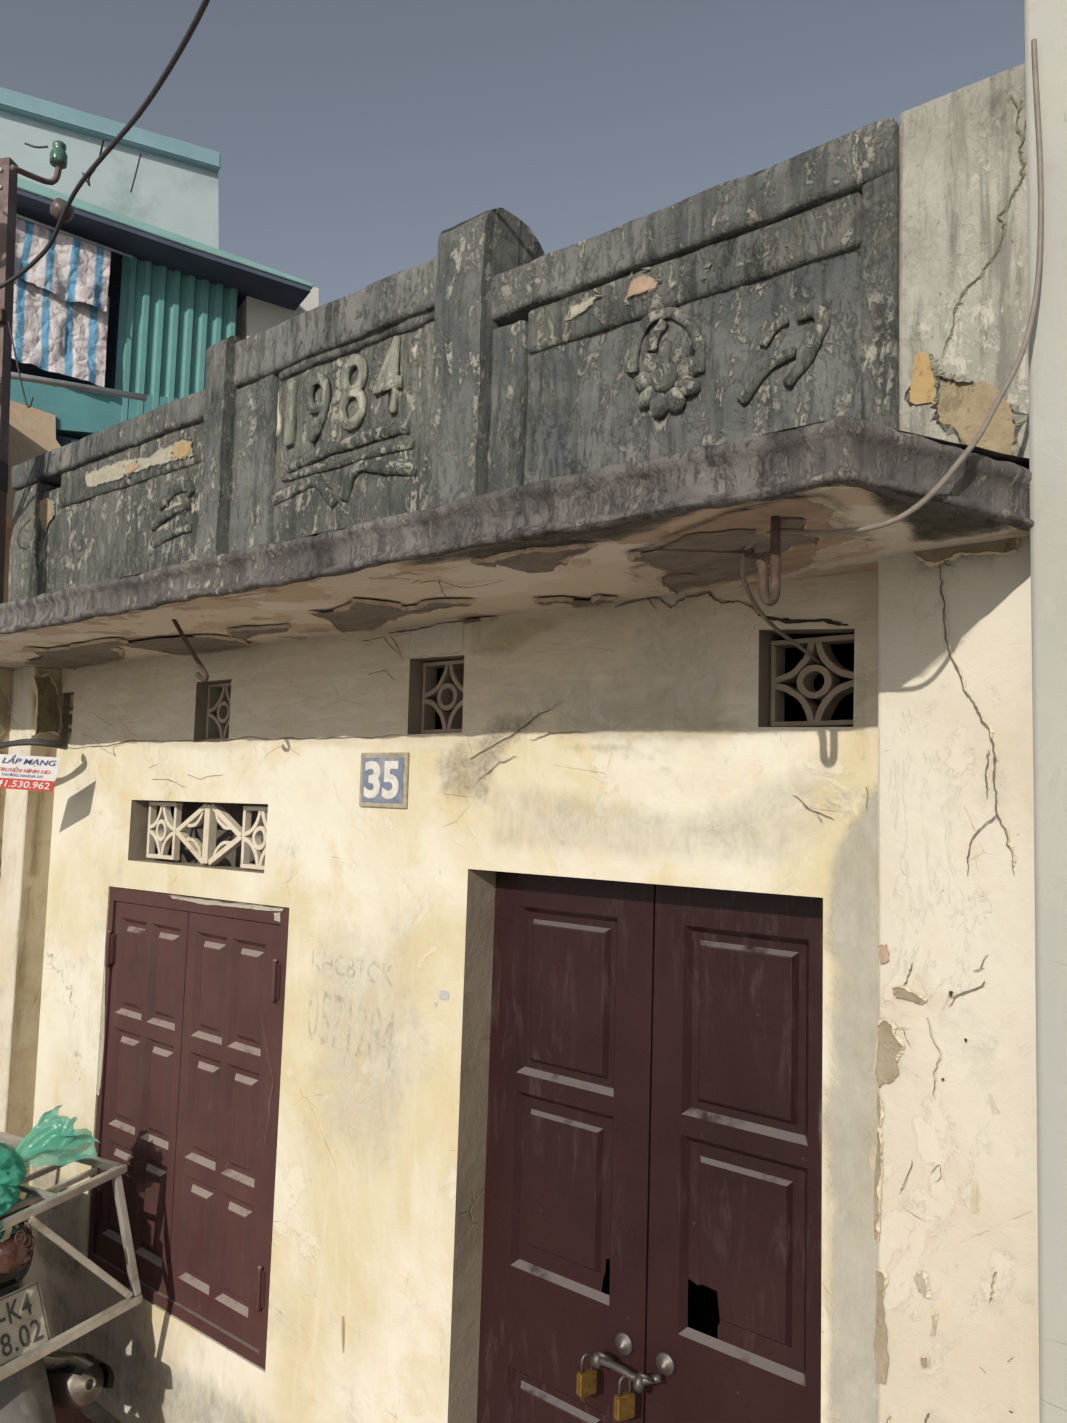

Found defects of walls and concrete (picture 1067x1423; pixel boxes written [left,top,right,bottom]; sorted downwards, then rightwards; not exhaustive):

crack [943,94,1027,354]
peeling [624,267,683,305]
flaking render [904,351,1028,457]
peeling [85,437,193,487]
flaking render [470,543,598,573]
flaking render [309,599,496,633]
flaking render [22,624,292,737]
crack [69,713,409,787]
crack [470,701,585,781]
crack [940,552,1017,876]
flaking render [874,1019,905,1242]
flaking render [873,1268,889,1385]